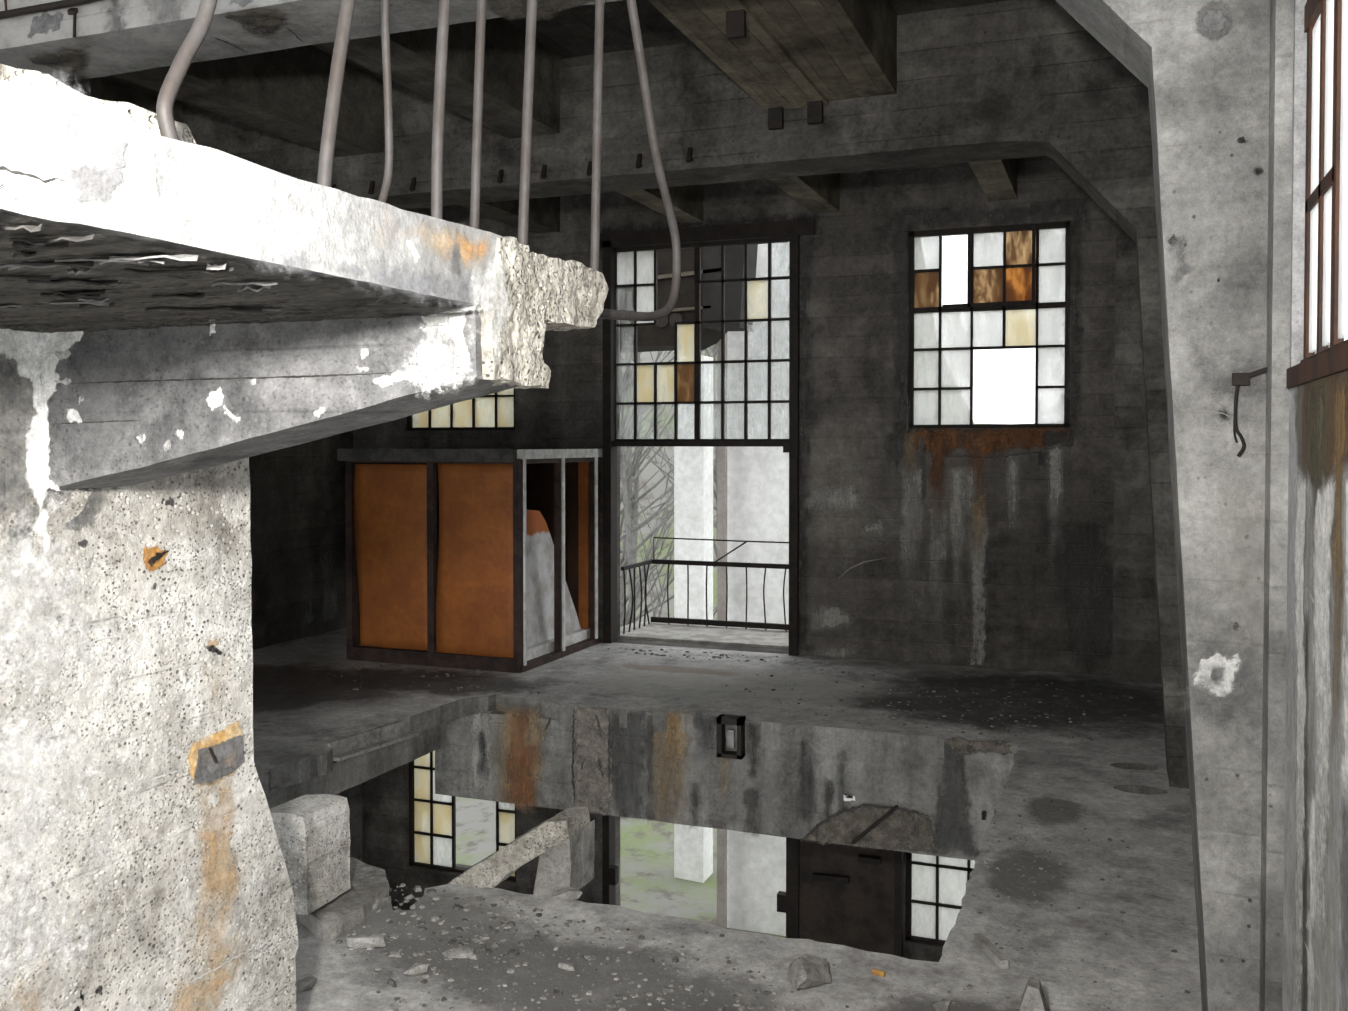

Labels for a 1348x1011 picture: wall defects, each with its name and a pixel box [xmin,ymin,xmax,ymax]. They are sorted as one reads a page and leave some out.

crack [0,166,67,187]
peeling [0,224,283,336]
rust [436,234,484,276]
peeling [67,398,82,423]
peeling [206,387,240,422]
peeling [358,349,416,388]
peeling [421,304,476,374]
leakage [885,200,1088,665]
rust [905,427,1073,541]
rust [1295,370,1348,699]
rust [471,710,545,806]
leakage [1293,474,1348,1011]